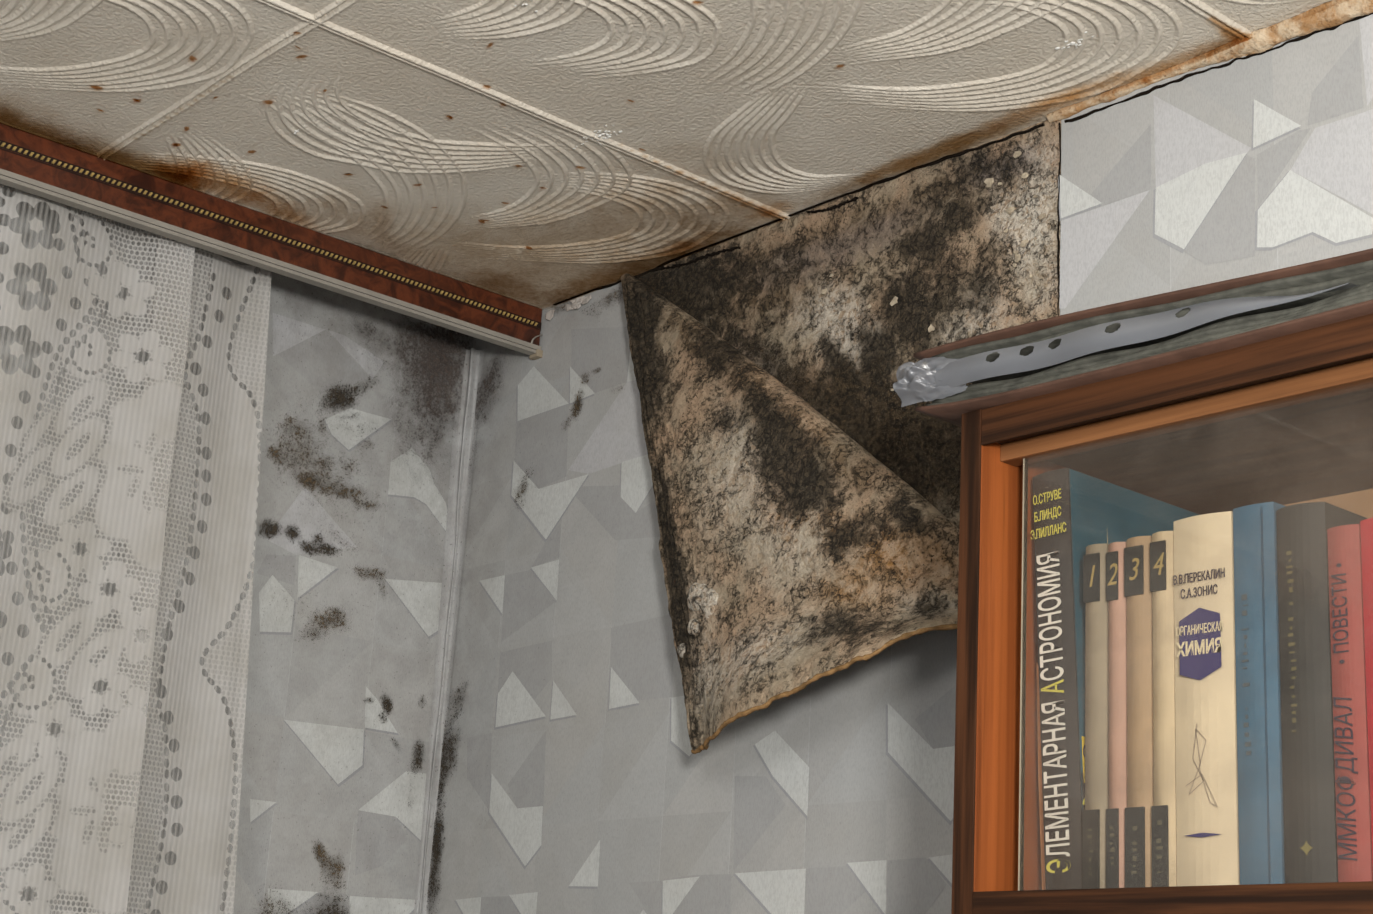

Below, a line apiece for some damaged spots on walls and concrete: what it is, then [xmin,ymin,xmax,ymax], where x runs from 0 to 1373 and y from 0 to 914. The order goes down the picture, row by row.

leakage [0,113,185,186]
flaking render [633,120,1061,528]
leakage [394,322,500,459]
leakage [258,377,376,556]
leakage [305,606,345,637]
leakage [365,695,393,723]
leakage [411,741,423,773]
leakage [427,683,465,914]
leakage [313,839,351,914]